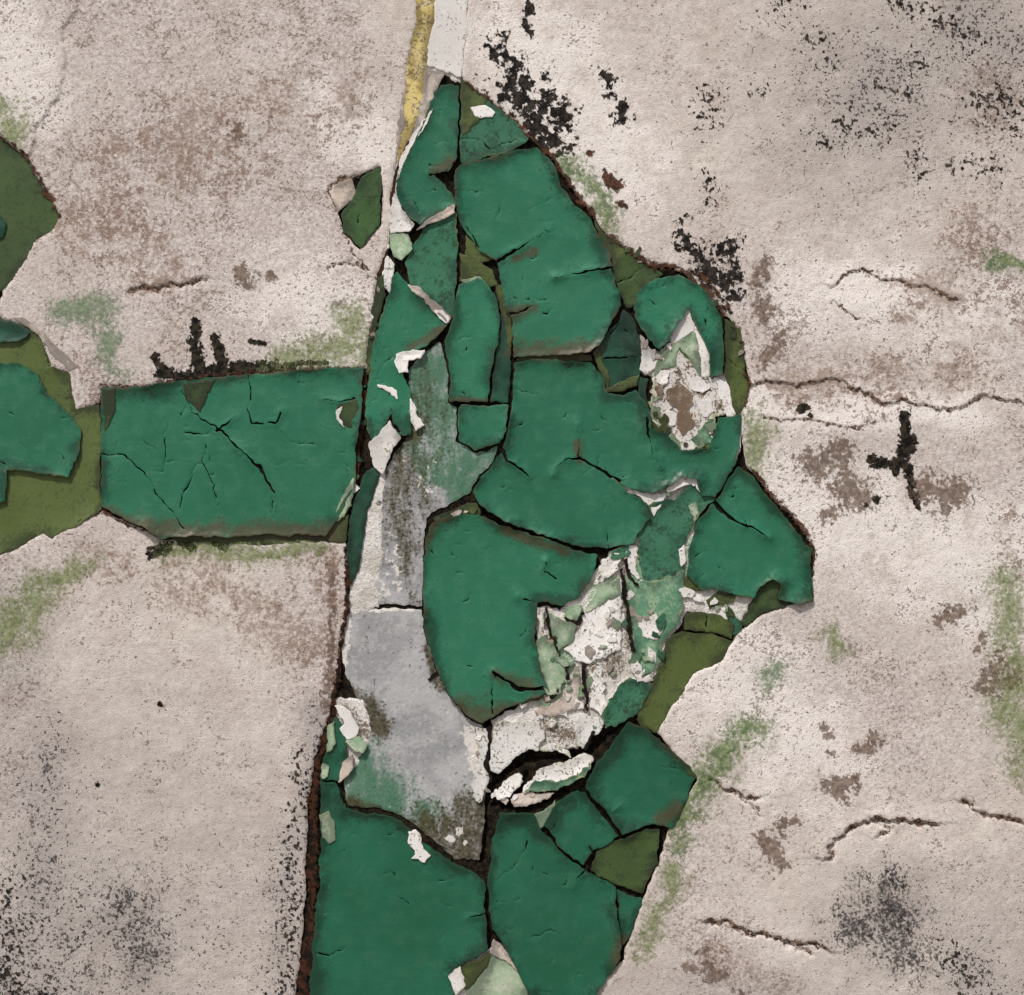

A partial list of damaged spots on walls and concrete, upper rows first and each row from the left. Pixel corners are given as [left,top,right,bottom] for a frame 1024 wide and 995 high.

damp [475,0,595,164]
damp [590,65,636,127]
damp [680,71,769,144]
crack [327,142,409,291]
damp [602,168,628,209]
crack [831,268,958,321]
damp [150,316,331,381]
crack [753,377,1022,431]
peeling [0,0,815,995]
damp [792,409,980,526]
crack [827,816,938,859]
crack [705,916,830,955]